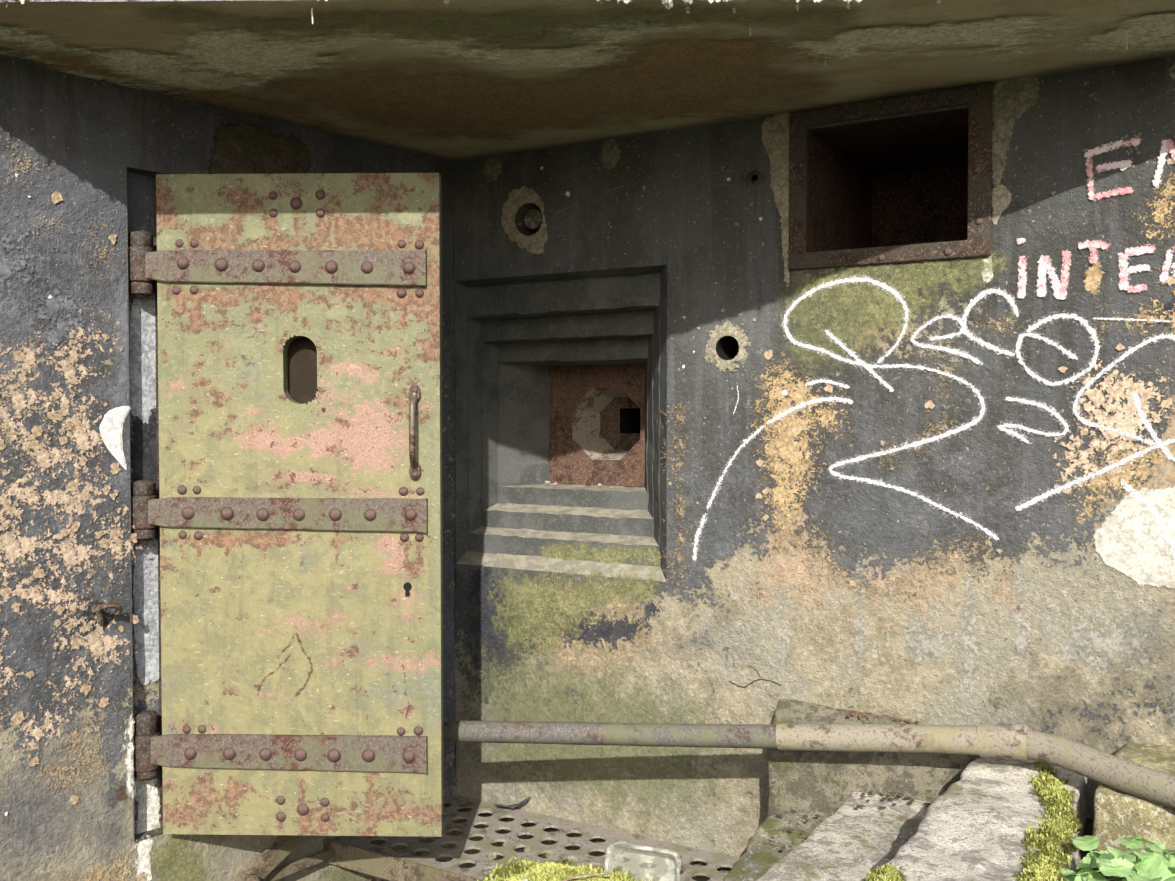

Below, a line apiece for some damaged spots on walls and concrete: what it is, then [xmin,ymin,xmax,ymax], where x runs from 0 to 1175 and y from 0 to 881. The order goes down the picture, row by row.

leakage [0,0,701,95]
leakage [768,17,1065,64]
leakage [1076,13,1175,91]
spalling [501,186,548,254]
peeling [1131,158,1175,246]
peeling [1048,262,1175,528]
peeling [693,318,1002,611]
spalling [0,292,159,810]